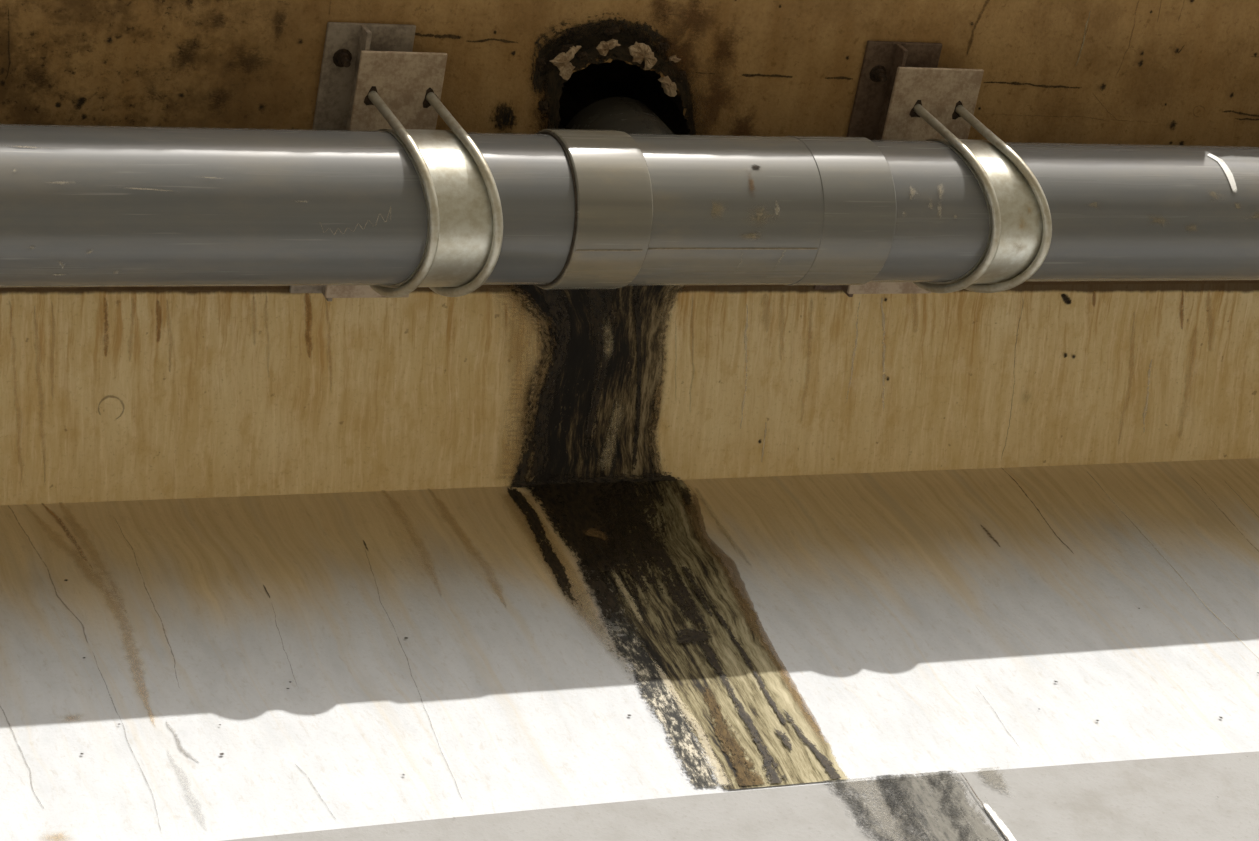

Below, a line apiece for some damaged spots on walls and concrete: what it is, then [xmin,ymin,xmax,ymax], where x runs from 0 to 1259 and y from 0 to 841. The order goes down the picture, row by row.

spalling [531,13,707,135]
water stain [506,284,1016,841]